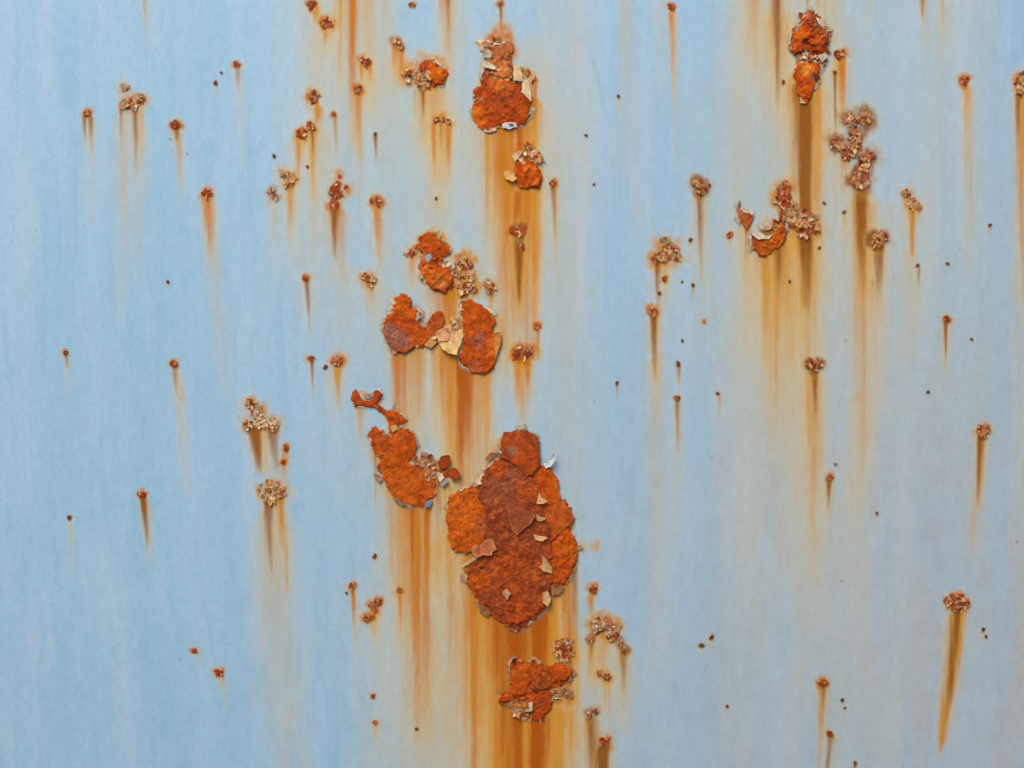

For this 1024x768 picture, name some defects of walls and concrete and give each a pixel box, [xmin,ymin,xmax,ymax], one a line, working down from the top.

rust [392,37,448,111]
rust [470,1,558,294]
rust [726,0,888,337]
rust [646,237,693,355]
rust [243,398,289,465]
rust [257,479,287,545]
rust [345,230,630,768]
rust [976,424,991,487]
rust [939,591,971,748]